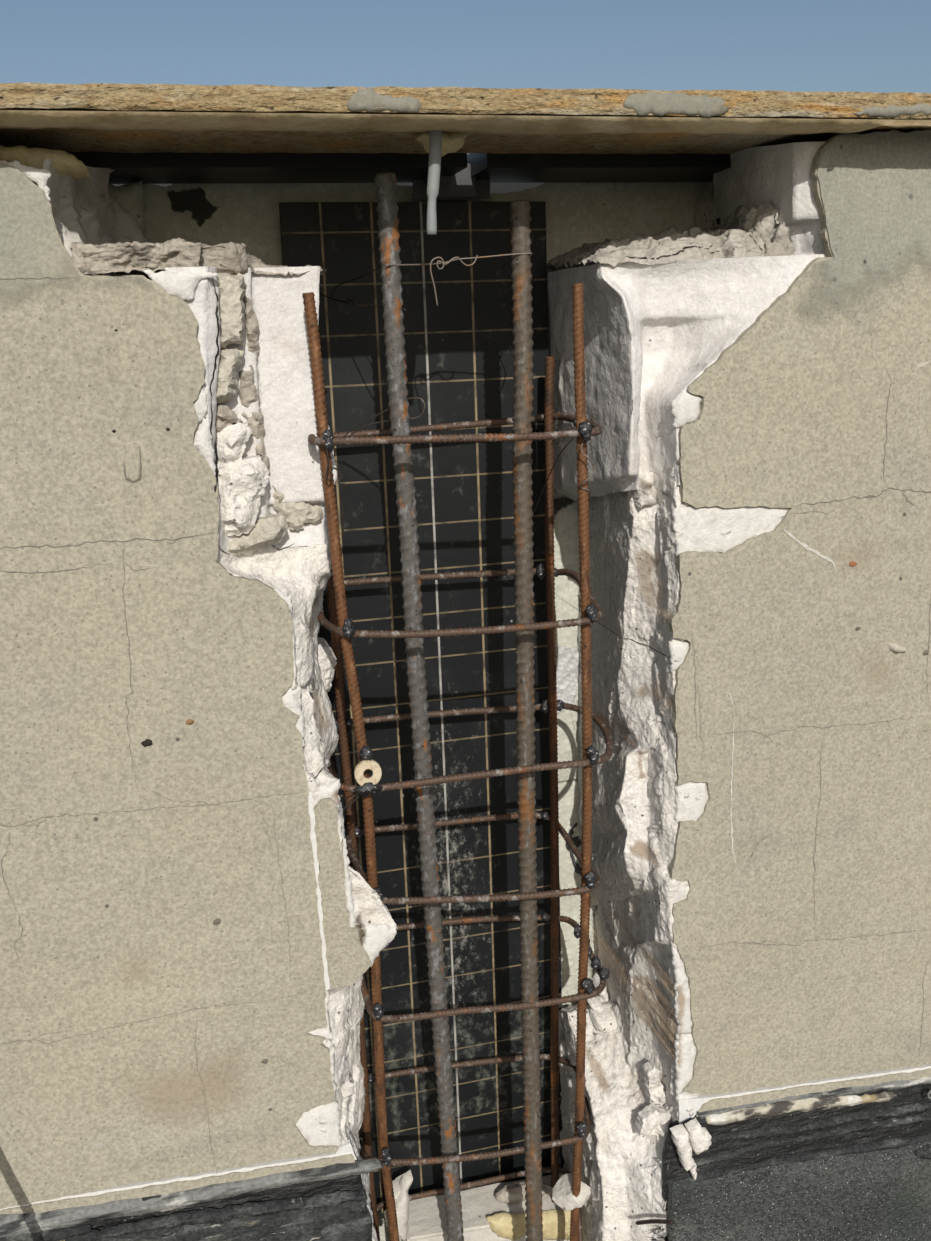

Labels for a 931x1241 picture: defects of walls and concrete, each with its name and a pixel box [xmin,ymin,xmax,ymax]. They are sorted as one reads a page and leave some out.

crack [0,533,324,1174]
spalling [143,266,398,1241]
spalling [547,254,827,1241]
crack [563,600,931,948]
crack [795,368,931,514]